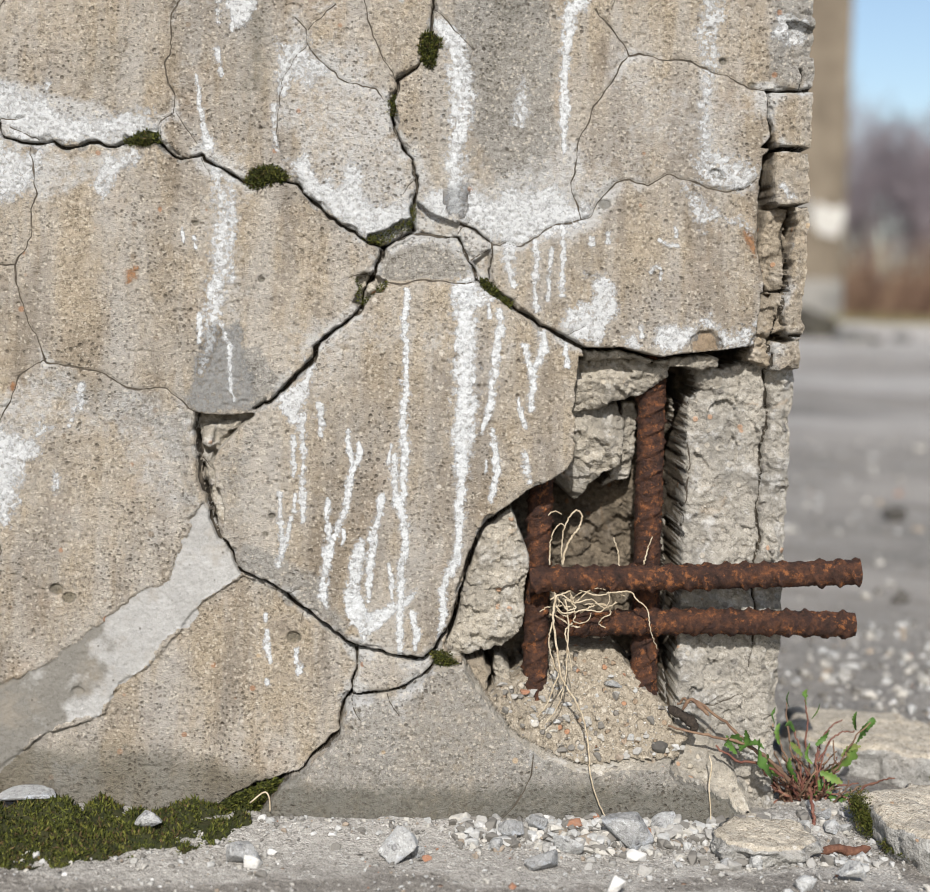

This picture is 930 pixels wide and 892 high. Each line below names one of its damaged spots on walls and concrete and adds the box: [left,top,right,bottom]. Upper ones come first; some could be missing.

crack [158,0,256,184]
crack [0,118,492,782]
leakage [275,358,326,568]
leakage [318,287,421,655]
leakage [291,0,591,313]
leakage [437,277,506,638]
spalling [445,490,529,696]
crack [255,0,809,409]
spalling [548,591,632,643]
spalling [550,93,845,567]
spalling [656,633,781,810]
crack [752,223,801,563]